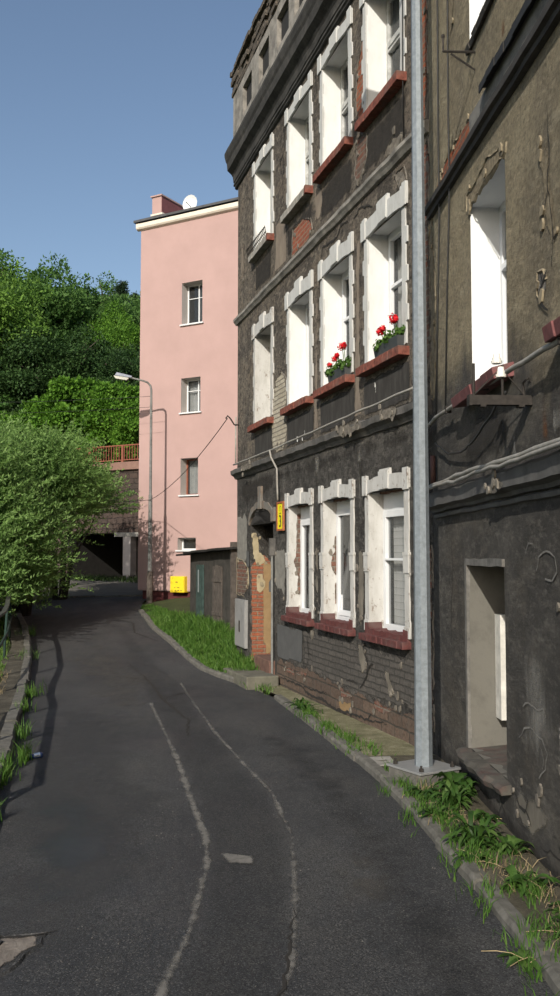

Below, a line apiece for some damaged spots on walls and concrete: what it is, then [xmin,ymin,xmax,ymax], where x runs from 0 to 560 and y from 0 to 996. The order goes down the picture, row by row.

spalling [466,141,507,215]
spalling [275,186,322,271]
spalling [535,268,548,305]
spalling [271,372,287,452]
spalling [236,513,415,746]